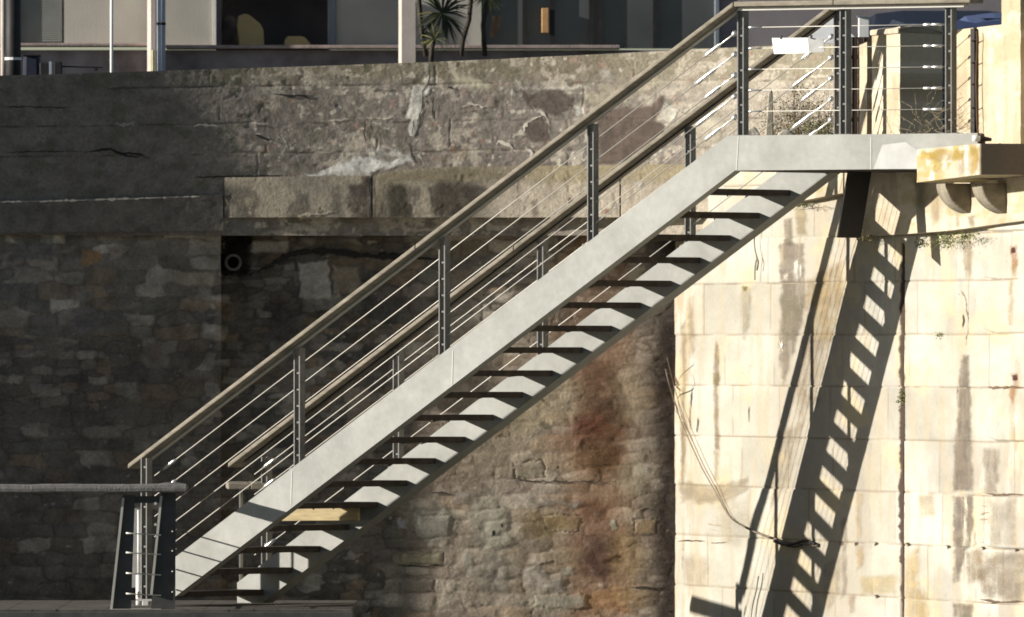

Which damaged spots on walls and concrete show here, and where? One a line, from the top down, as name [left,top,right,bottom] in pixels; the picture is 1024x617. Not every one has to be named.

crack [7,148,148,158]
damp [779,208,841,402]
damp [953,356,1024,599]
damp [953,604,972,617]